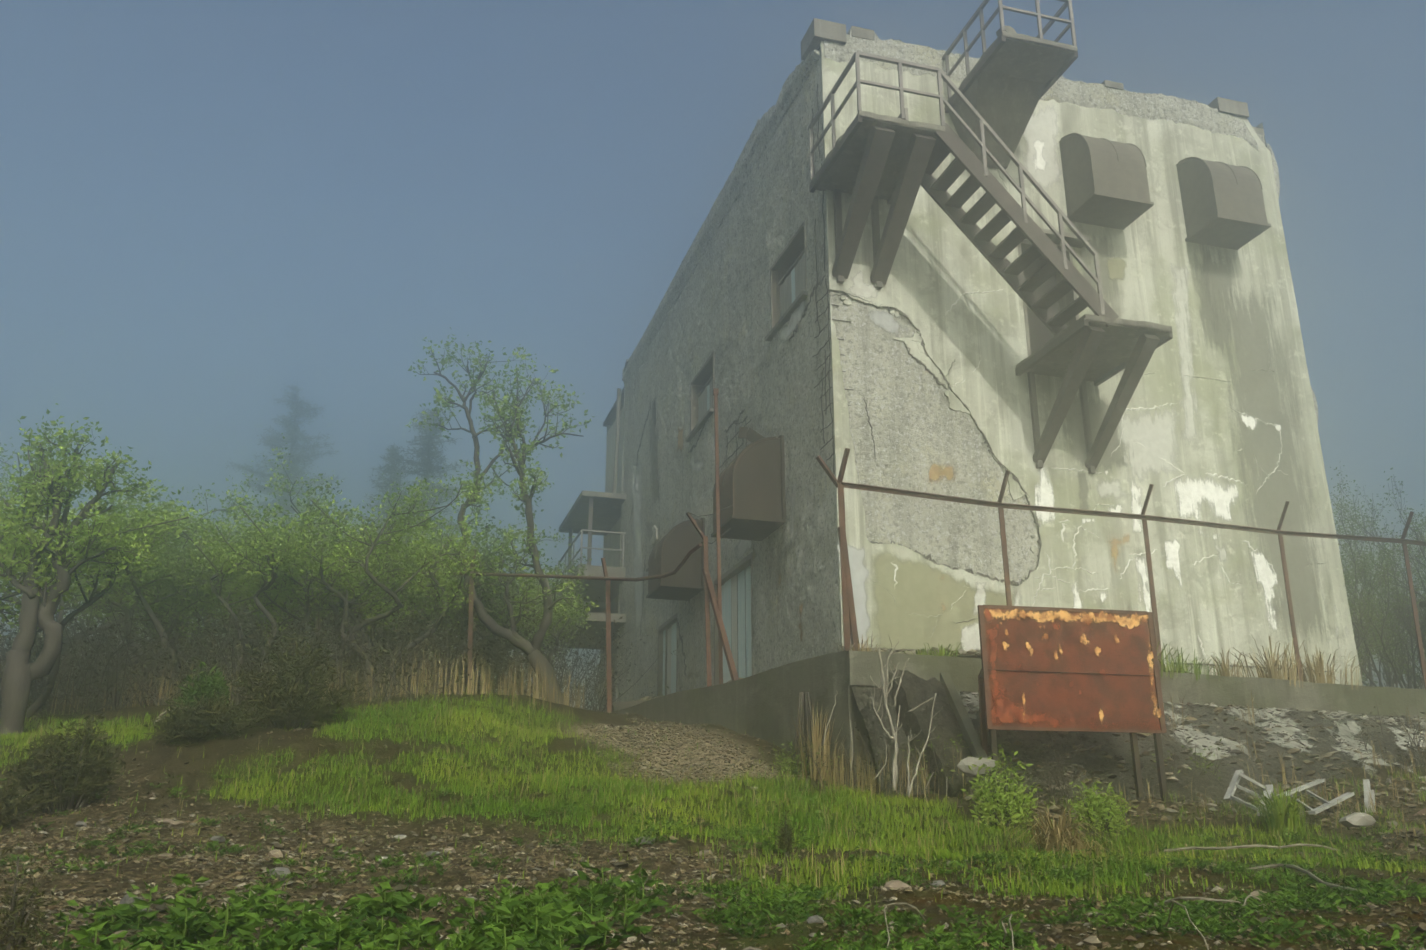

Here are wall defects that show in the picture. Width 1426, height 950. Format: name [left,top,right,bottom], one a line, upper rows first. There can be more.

crack [863,395,876,457]